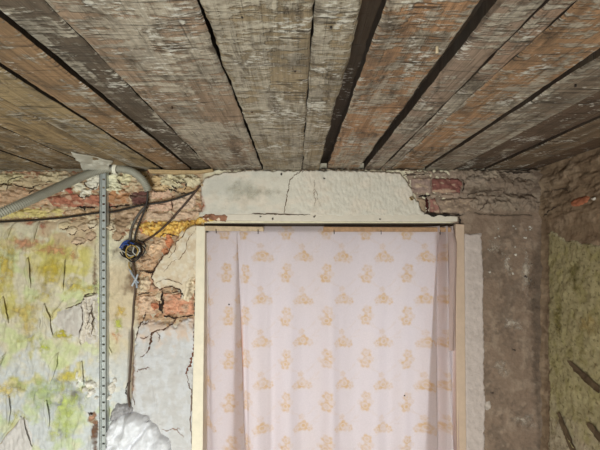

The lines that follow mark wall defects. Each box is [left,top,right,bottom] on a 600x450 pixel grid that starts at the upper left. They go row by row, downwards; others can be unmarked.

crack [252,170,318,218]
flaking render [403,170,476,224]
flaking render [0,171,227,324]
crack [151,225,194,298]
damp [31,381,78,437]
crack [125,312,176,405]
crack [162,324,194,450]